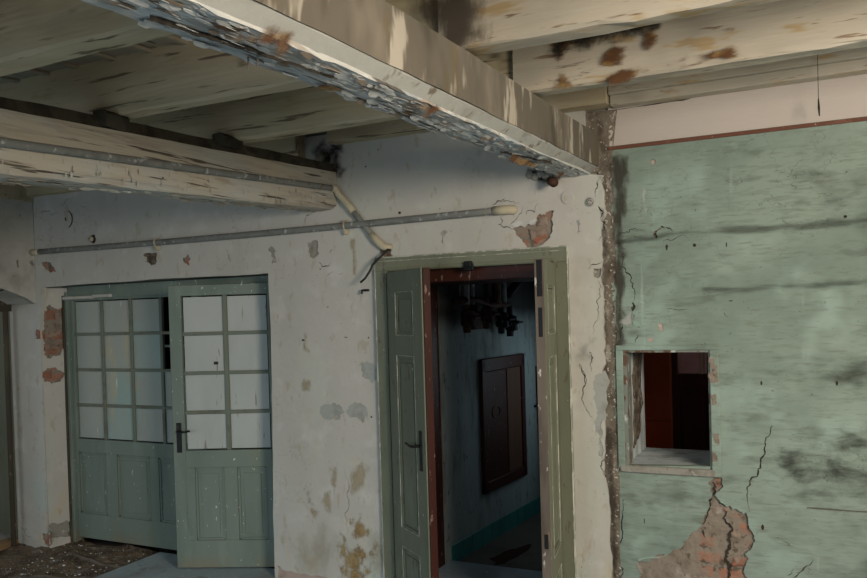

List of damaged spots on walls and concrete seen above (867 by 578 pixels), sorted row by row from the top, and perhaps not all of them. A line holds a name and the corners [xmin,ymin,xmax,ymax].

leakage [602,41,638,85]
leakage [642,27,658,50]
leakage [705,48,736,59]
flaking render [511,210,554,248]
crack [622,258,638,342]
flaking render [36,305,64,384]
crack [581,352,593,410]
crack [746,427,771,513]
spalling [0,520,158,578]
flaking render [636,477,755,578]